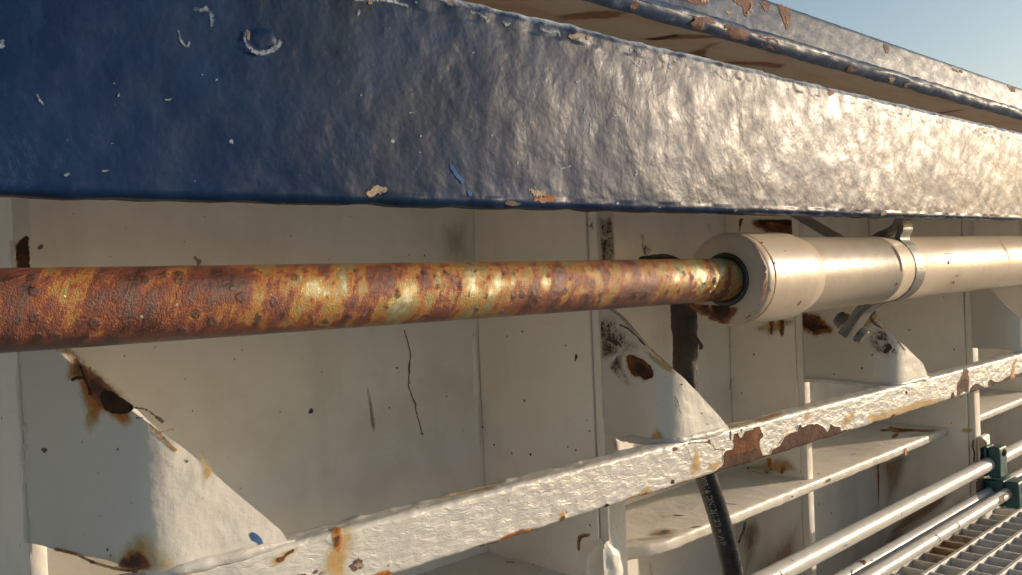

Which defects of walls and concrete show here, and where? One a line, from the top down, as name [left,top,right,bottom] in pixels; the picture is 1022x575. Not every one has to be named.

peeling [528,188,555,203]
rust [16,236,30,268]
rust [688,218,833,336]
rust [64,349,134,426]
crack [404,330,423,435]
rust [625,349,673,382]
rust [54,540,164,573]
rust [298,527,364,575]